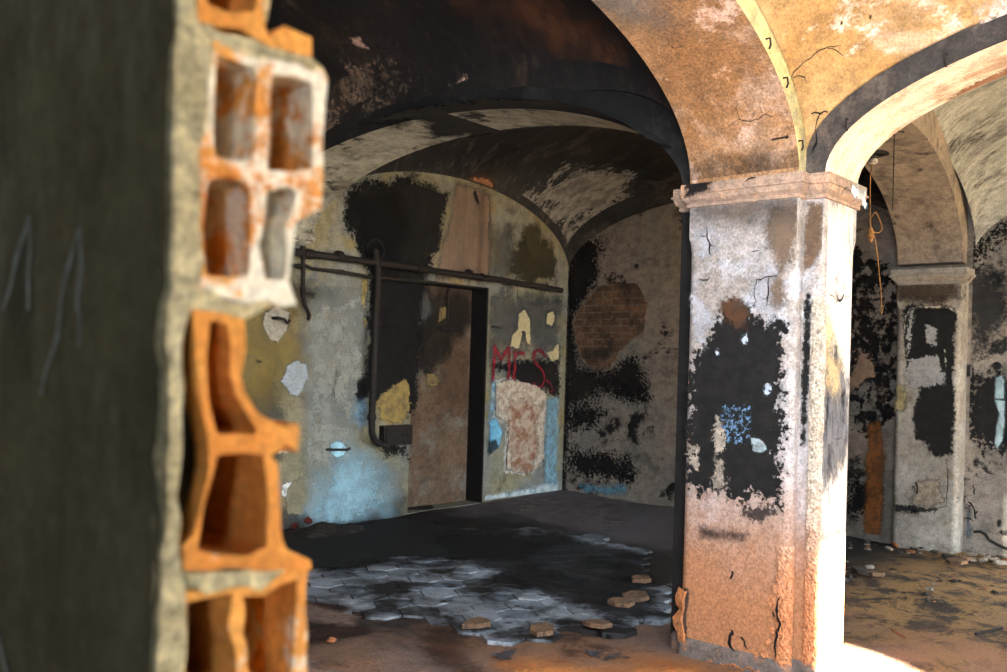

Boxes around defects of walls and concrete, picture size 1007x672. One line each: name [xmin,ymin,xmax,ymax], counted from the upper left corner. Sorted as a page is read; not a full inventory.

peeling [324,36,411,133]
crack [791,45,843,82]
flaking render [573,281,647,372]
peeling [689,295,713,350]
peeling [376,379,412,425]
flaking render [492,377,547,476]
water stain [684,441,700,471]
water stain [711,414,728,492]
spalling [706,273,844,672]
water stain [863,421,885,535]
water stain [995,376,1005,448]
peeling [672,587,689,651]